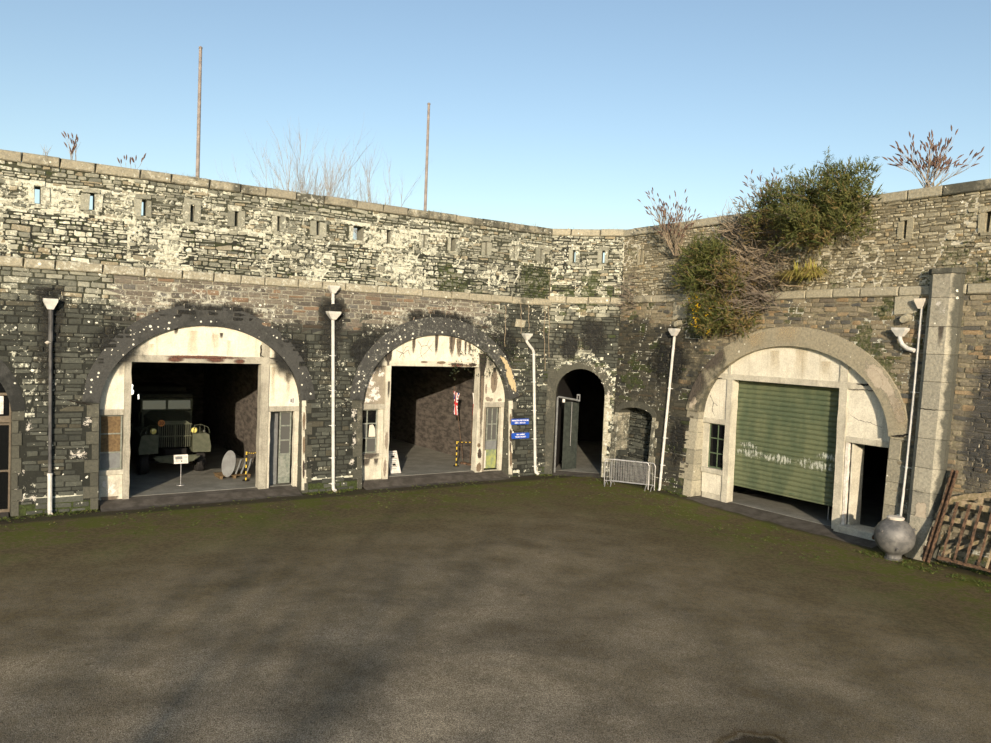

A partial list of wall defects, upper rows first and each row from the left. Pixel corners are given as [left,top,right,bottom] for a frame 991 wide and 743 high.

corrosion [168,355,245,363]
peeling [364,367,390,403]